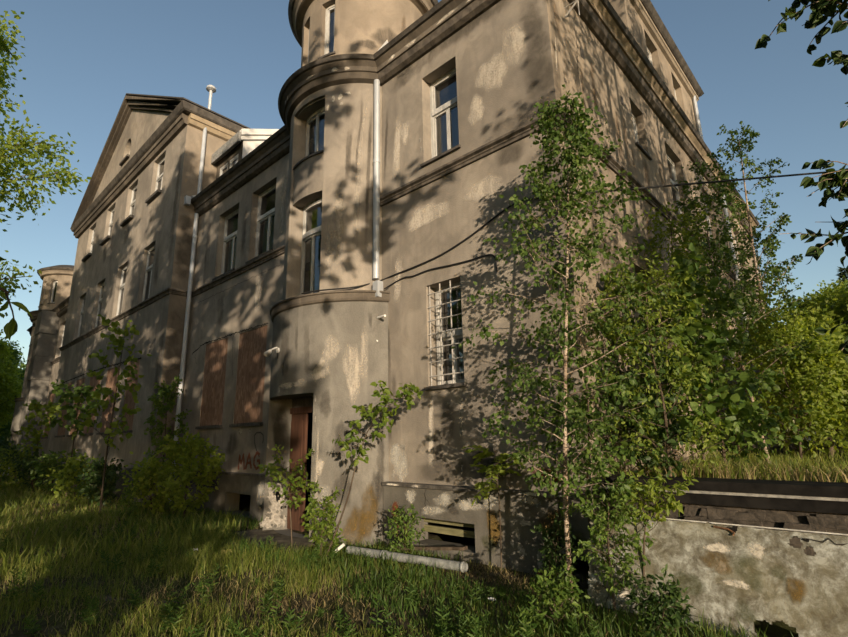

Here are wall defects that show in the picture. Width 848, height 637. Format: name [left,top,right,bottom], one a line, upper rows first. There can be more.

damp [510,27,525,61]
damp [478,57,506,87]
damp [471,97,483,121]
spalling [259,476,289,530]
peeling [441,494,477,514]